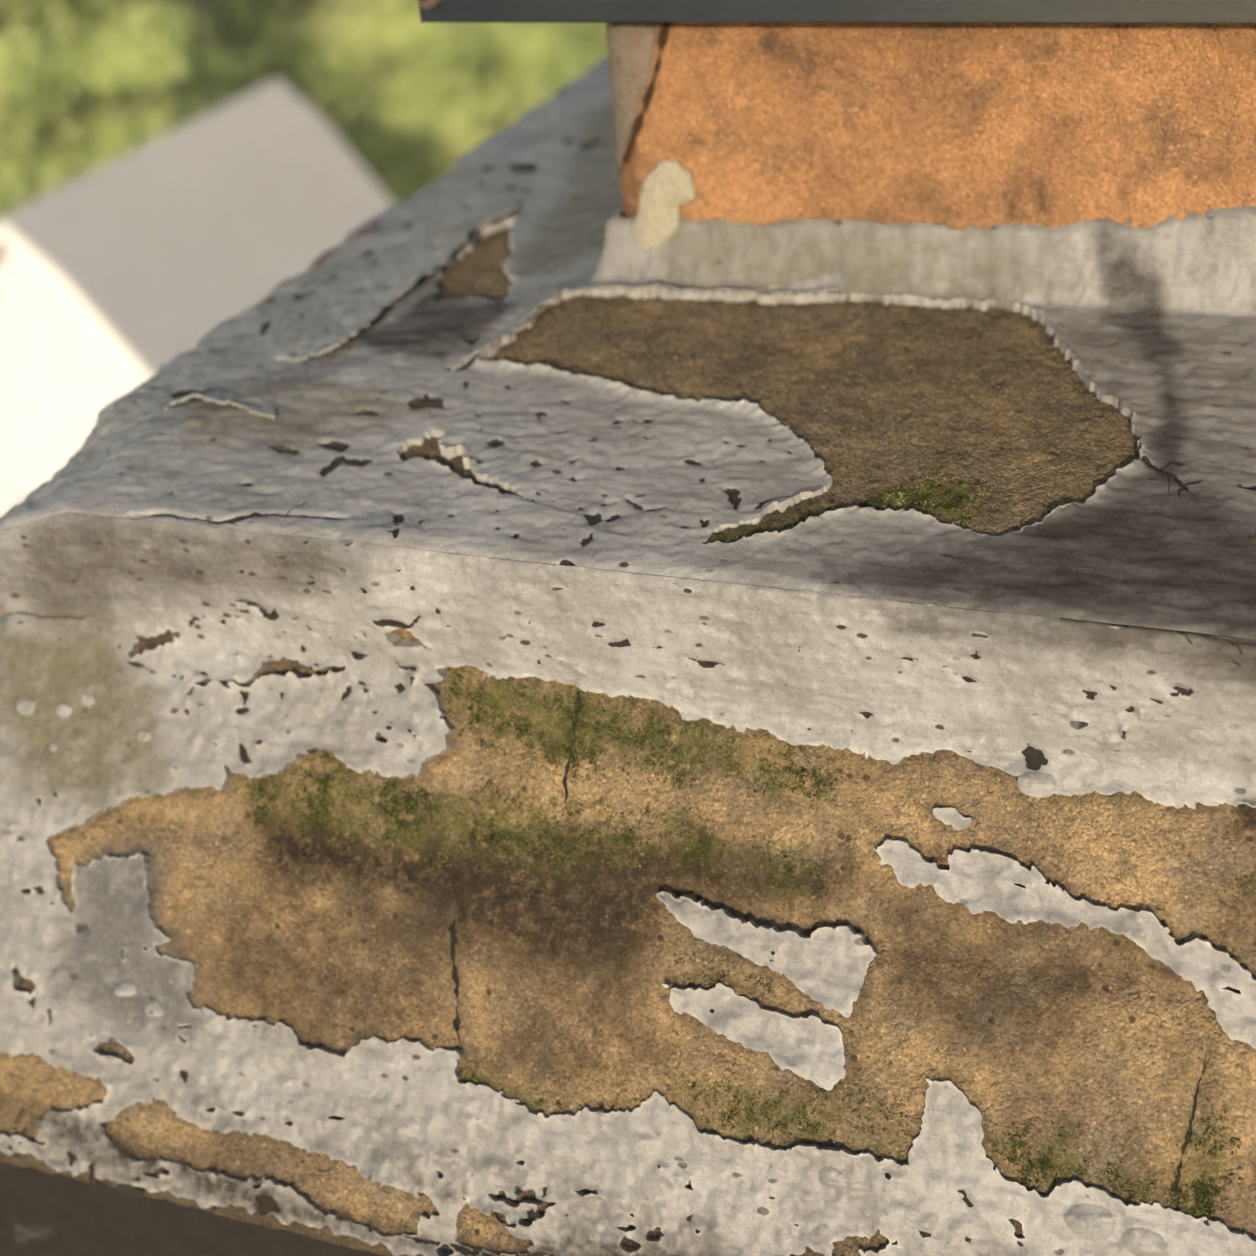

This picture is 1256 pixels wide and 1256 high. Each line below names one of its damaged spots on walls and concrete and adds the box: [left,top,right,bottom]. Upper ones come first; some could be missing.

peeling [250,162,543,363]
leakage [1103,243,1176,357]
peeling [447,232,1139,547]
peeling [316,441,373,477]
peeling [399,437,517,496]
peeling [127,616,205,673]
peeling [219,600,313,631]
peeling [363,615,421,642]
peeling [172,645,367,716]
peeling [49,660,1256,1238]
peeling [0,1053,107,1138]
peeling [457,1203,534,1254]